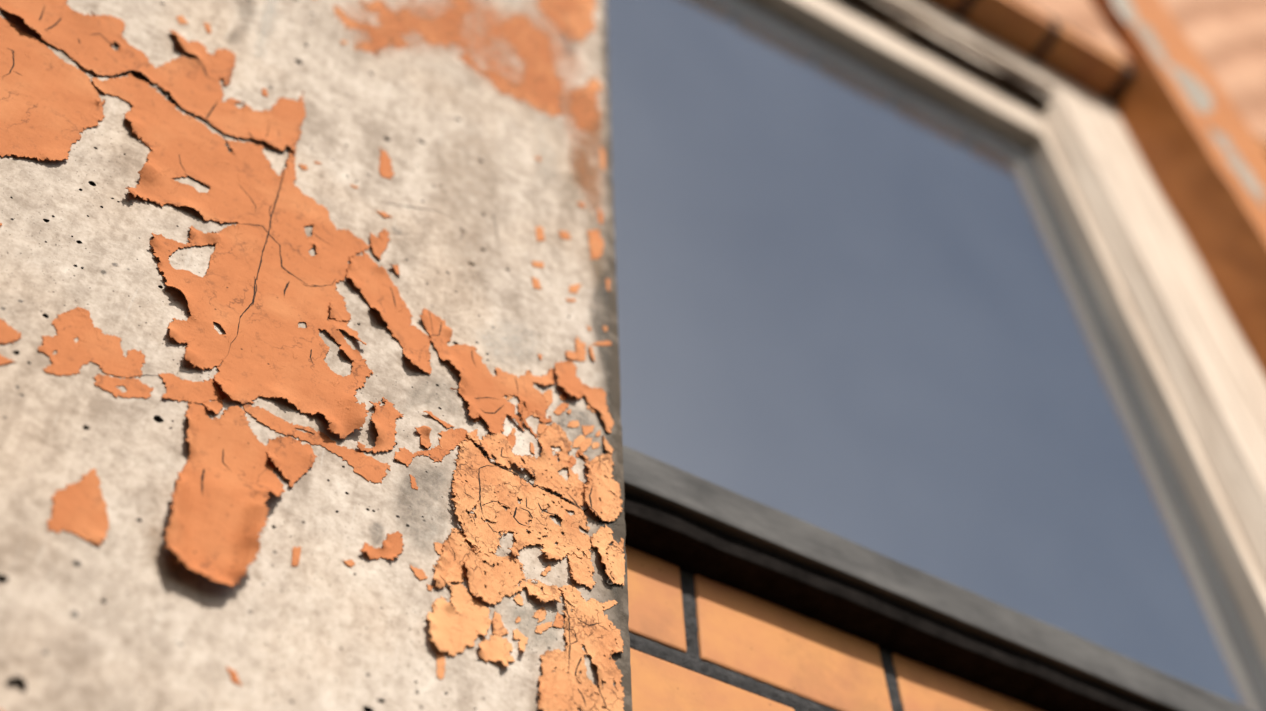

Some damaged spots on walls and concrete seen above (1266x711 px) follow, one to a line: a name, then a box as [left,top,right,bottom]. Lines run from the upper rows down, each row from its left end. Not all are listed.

crack [39,6,336,370]
peeling [0,0,614,588]